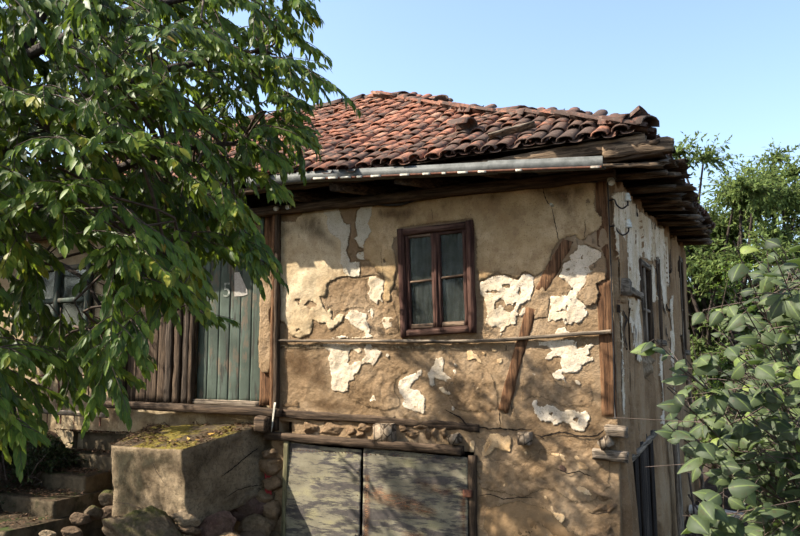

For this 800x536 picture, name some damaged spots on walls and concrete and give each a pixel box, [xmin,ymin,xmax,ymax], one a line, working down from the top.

spalling [323,206,502,414]
spalling [470,235,610,523]
flaking render [611,190,675,425]